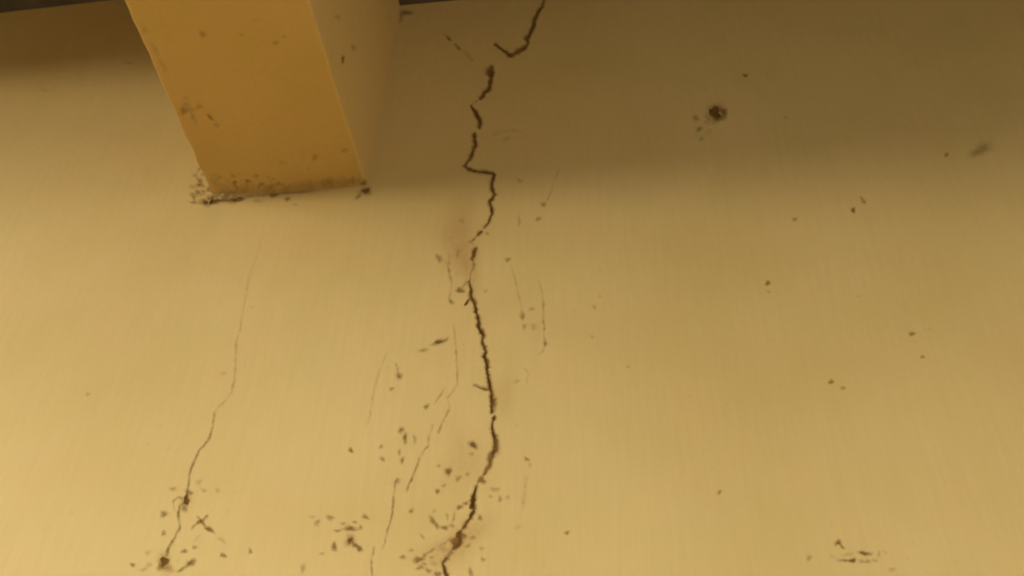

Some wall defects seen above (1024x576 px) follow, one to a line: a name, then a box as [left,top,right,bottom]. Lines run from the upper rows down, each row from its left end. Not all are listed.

spalling [202,180,370,205]
crack [442,0,545,576]